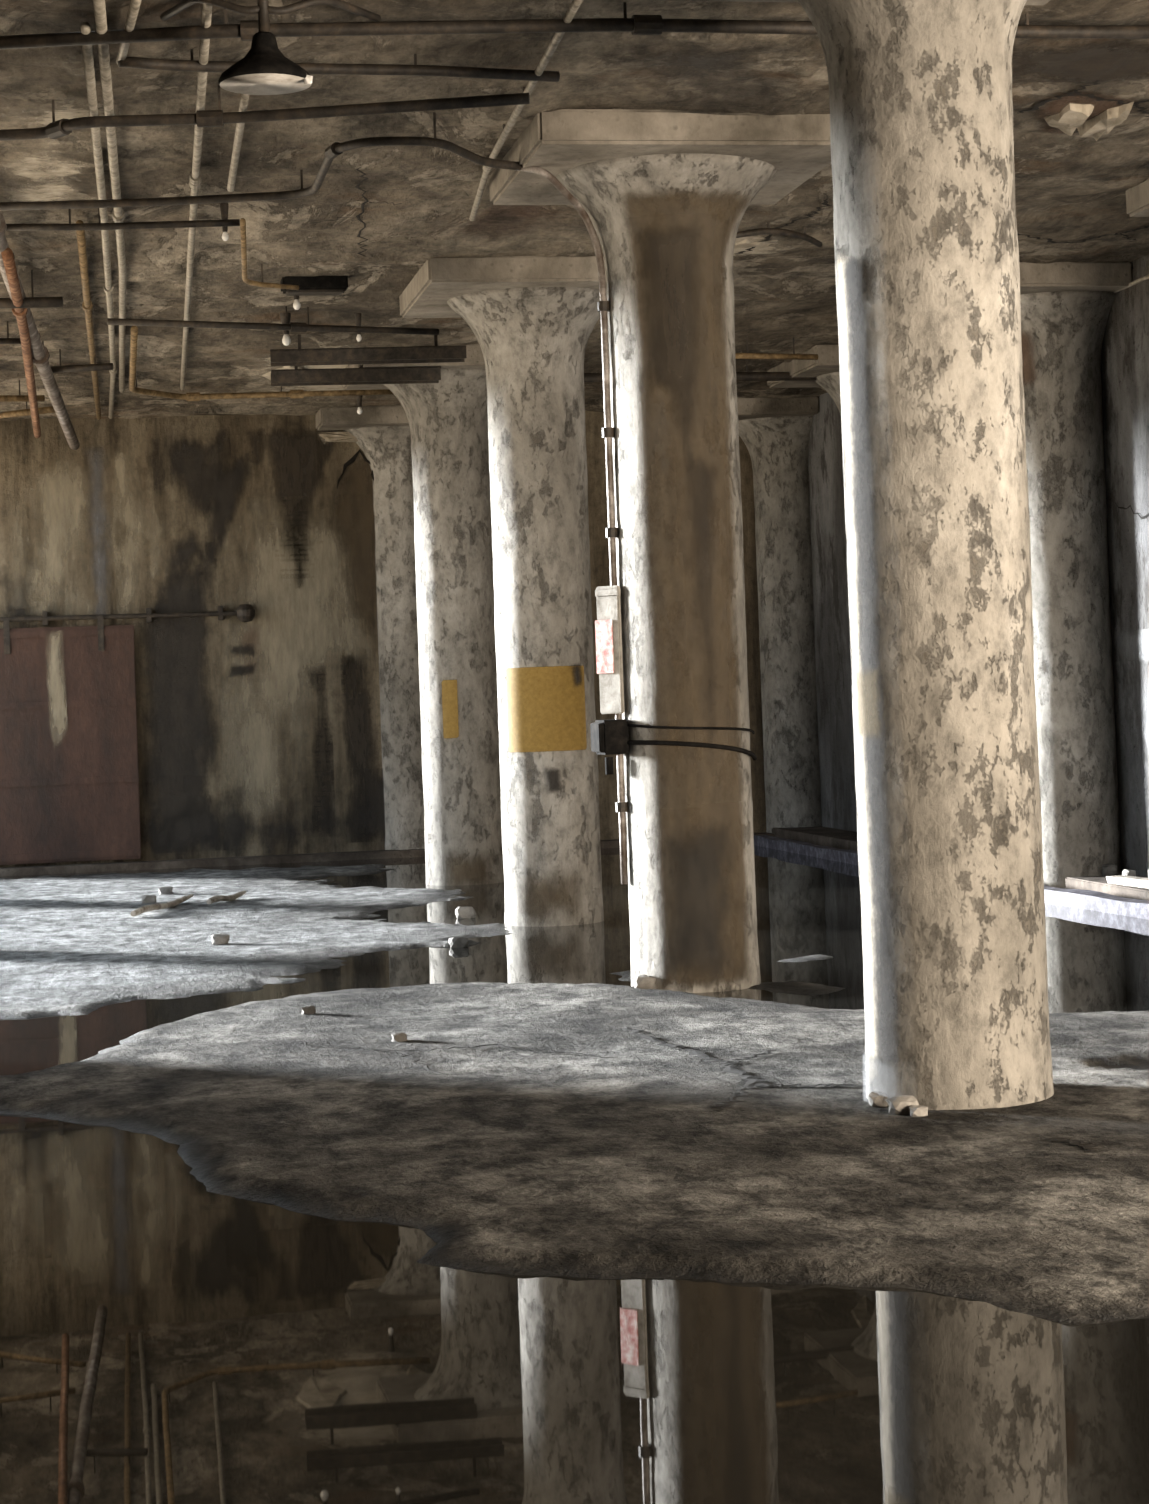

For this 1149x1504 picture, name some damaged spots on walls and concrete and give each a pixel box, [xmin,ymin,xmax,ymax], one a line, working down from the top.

leakage [7,430,385,859]